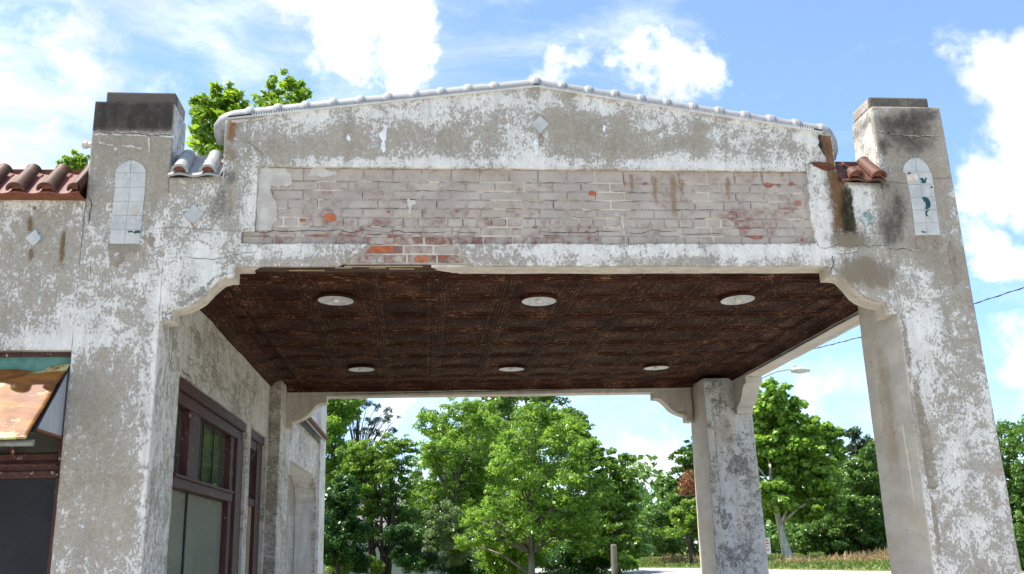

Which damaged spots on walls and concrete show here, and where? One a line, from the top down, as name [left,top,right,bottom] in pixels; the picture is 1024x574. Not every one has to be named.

peeling [379,124,391,153]
crack [876,130,942,143]
spalling [342,235,472,266]
water stain [822,187,895,288]
crack [817,231,923,270]
peeling [901,319,912,369]
peeling [914,381,941,554]